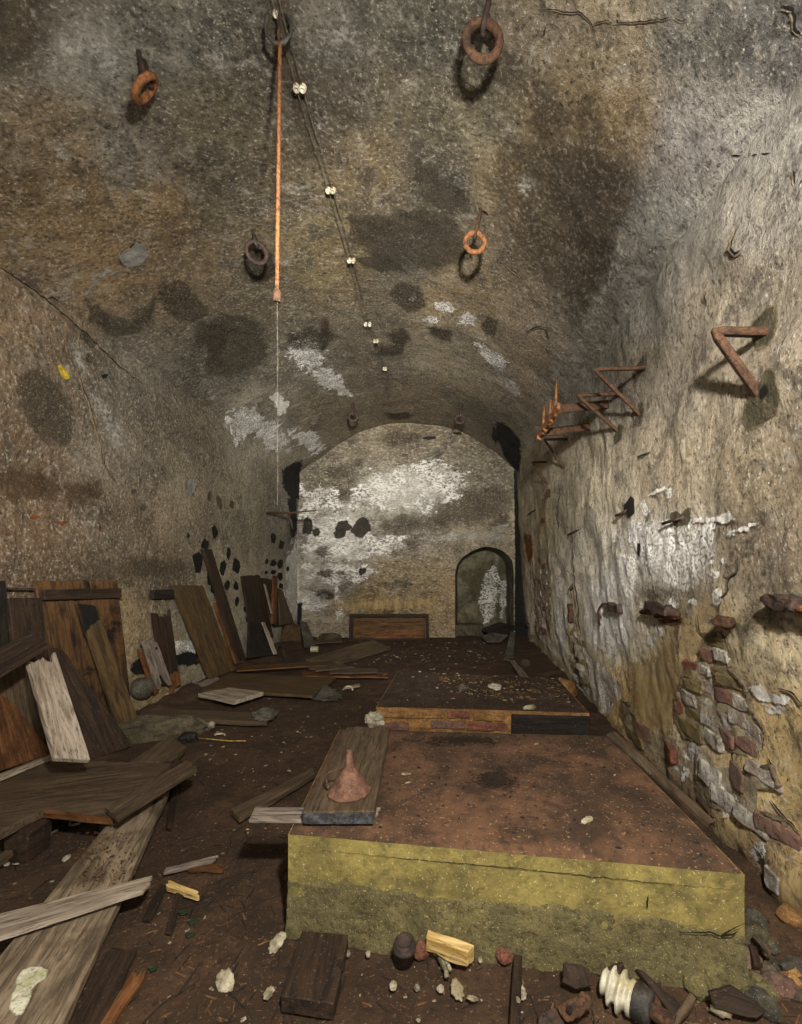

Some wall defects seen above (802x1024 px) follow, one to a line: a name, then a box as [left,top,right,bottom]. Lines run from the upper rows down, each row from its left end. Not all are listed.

crack [539,9,688,38]
damp [16,369,76,446]
crack [1,268,144,485]
damp [84,269,267,382]
damp [223,402,328,457]
damp [285,318,353,397]
damp [346,160,520,396]
damp [488,95,632,339]
damp [283,458,510,624]
damp [574,500,735,741]
flaking render [618,631,802,852]
flaking render [764,865,780,896]